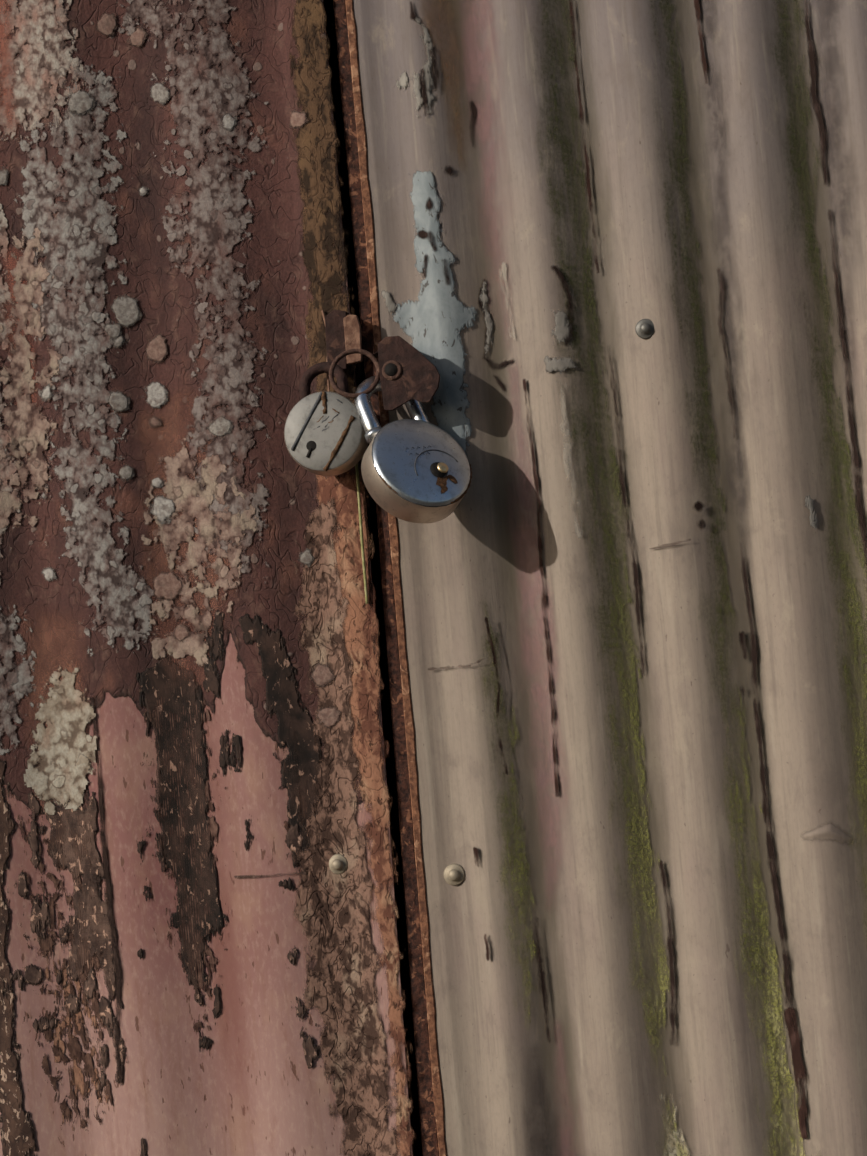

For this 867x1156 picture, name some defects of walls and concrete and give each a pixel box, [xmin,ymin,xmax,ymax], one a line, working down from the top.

peeling [381,171,476,456]
peeling [0,760,127,1156]
corrosion [0,0,414,1156]
peeling [132,498,396,1156]
crack [428,617,508,775]
crack [472,847,480,867]
crack [483,934,491,961]
crack [478,280,559,797]
crack [535,918,550,1042]
crack [739,557,807,1139]